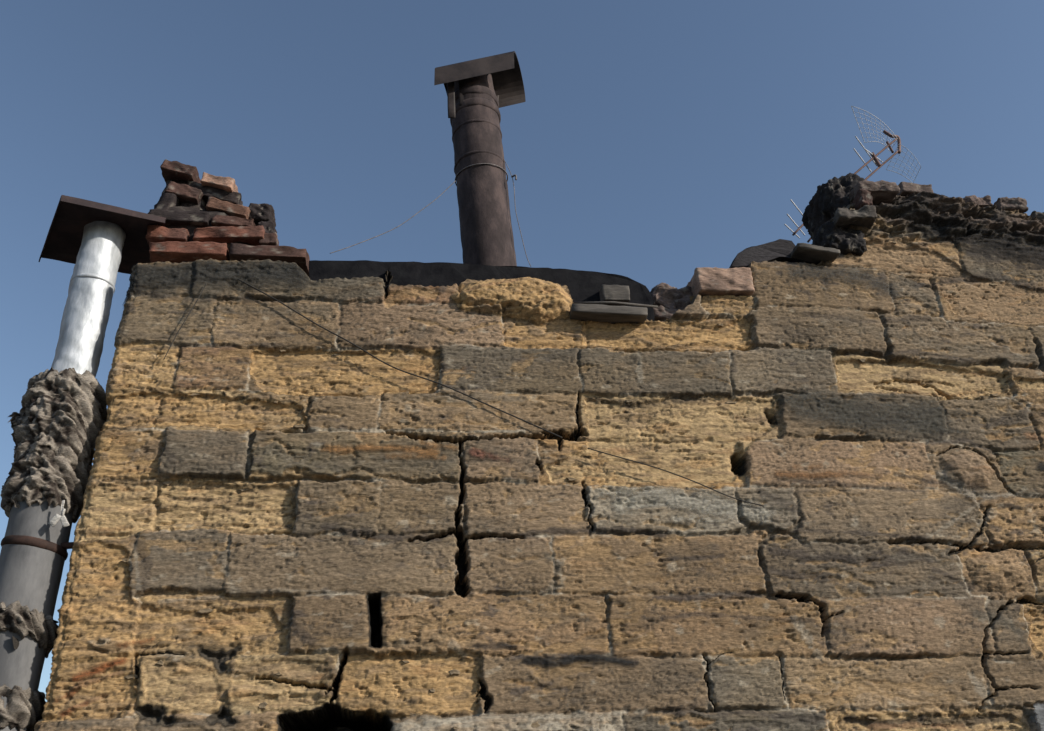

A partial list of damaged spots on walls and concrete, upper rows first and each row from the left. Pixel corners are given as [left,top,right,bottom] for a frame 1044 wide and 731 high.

crack [515,393,583,469]
crack [408,436,515,598]
crack [581,485,594,531]
crack [889,511,1044,562]
crack [775,594,841,634]
crack [264,656,347,726]
crack [703,652,732,711]
crack [778,656,786,700]
crack [981,598,1041,701]